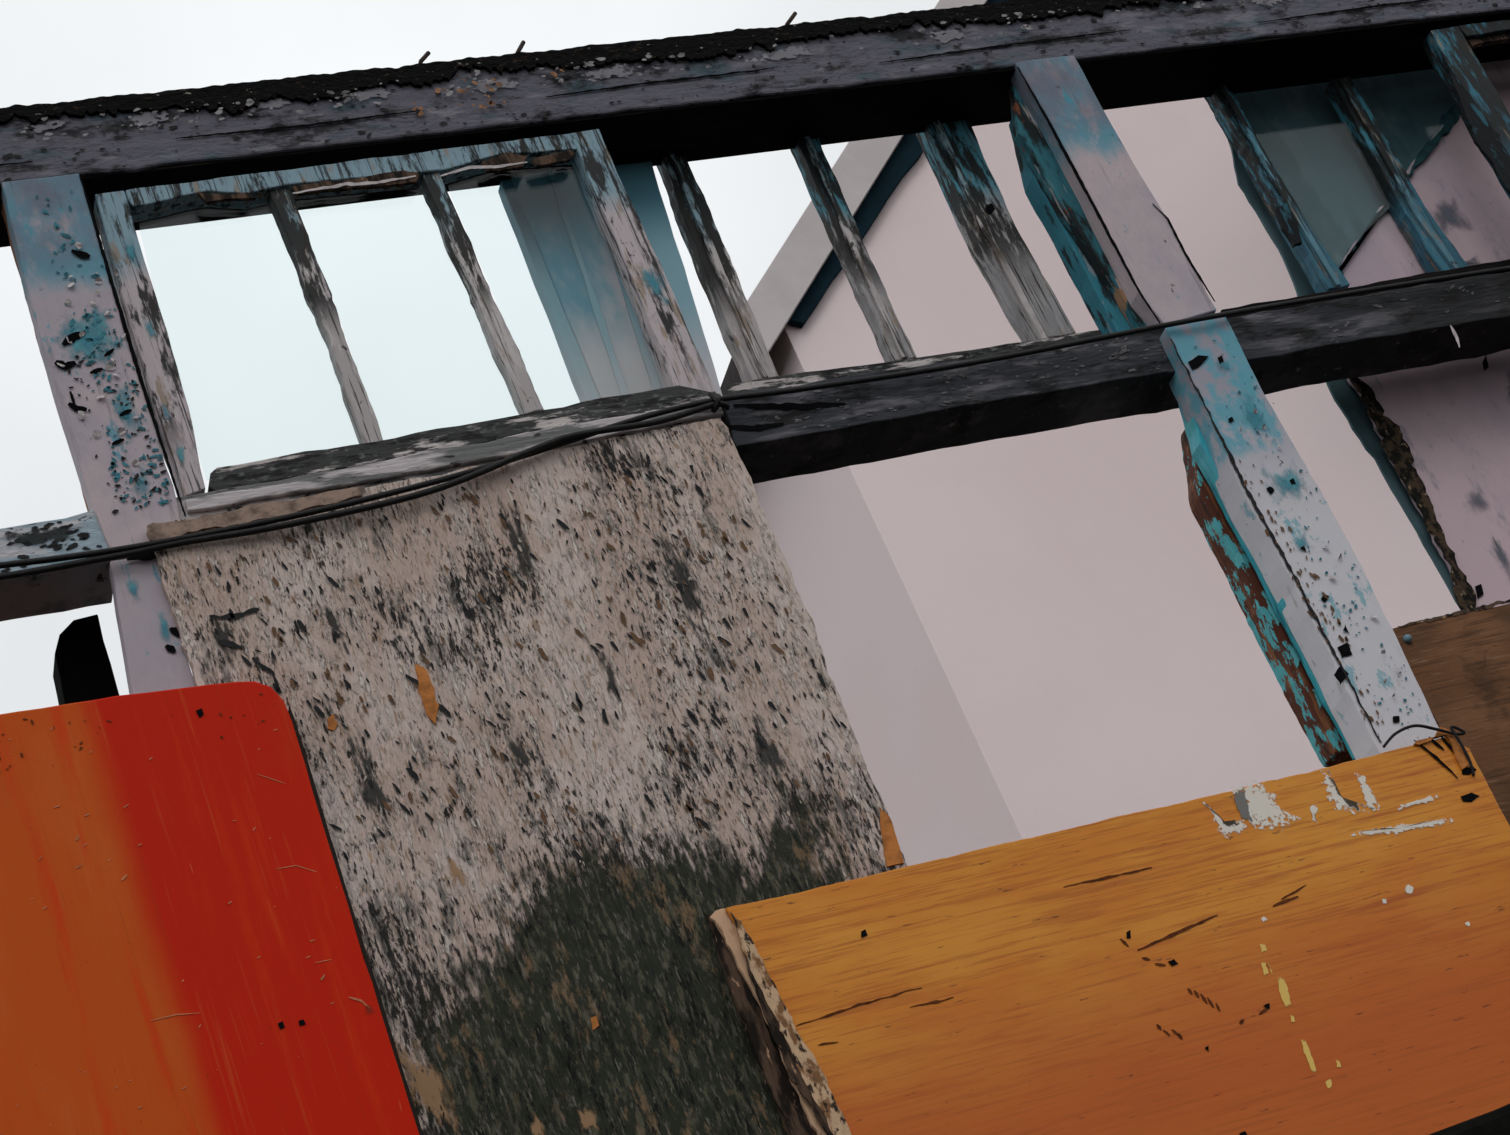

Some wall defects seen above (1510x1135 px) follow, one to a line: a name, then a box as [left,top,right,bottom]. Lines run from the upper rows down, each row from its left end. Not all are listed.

peeling [35,195,104,282]
peeling [0,521,102,572]
peeling [64,303,184,514]
peeling [1226,376,1428,725]
spalling [1349,377,1510,628]
peeling [1203,770,1453,839]
water stain [395,715,865,1135]